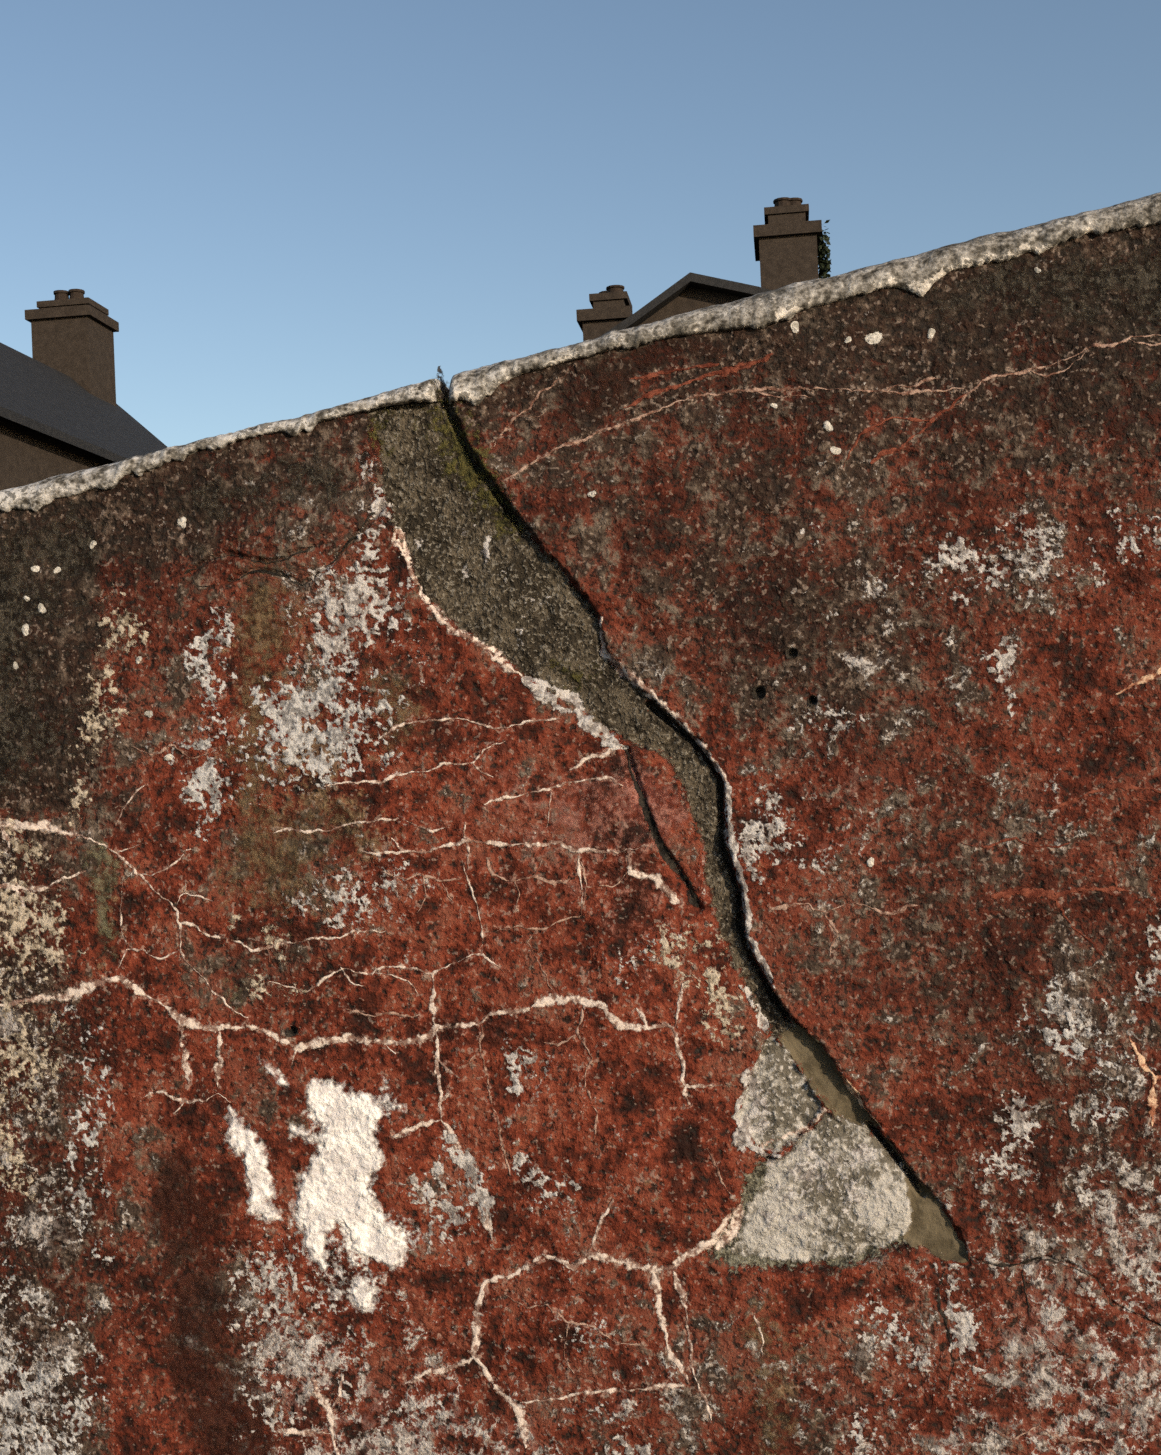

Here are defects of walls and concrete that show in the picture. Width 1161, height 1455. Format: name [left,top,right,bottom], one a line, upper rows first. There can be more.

damp [227,586,306,890]
crack [0,334,1161,1455]
damp [227,1079,419,1312]